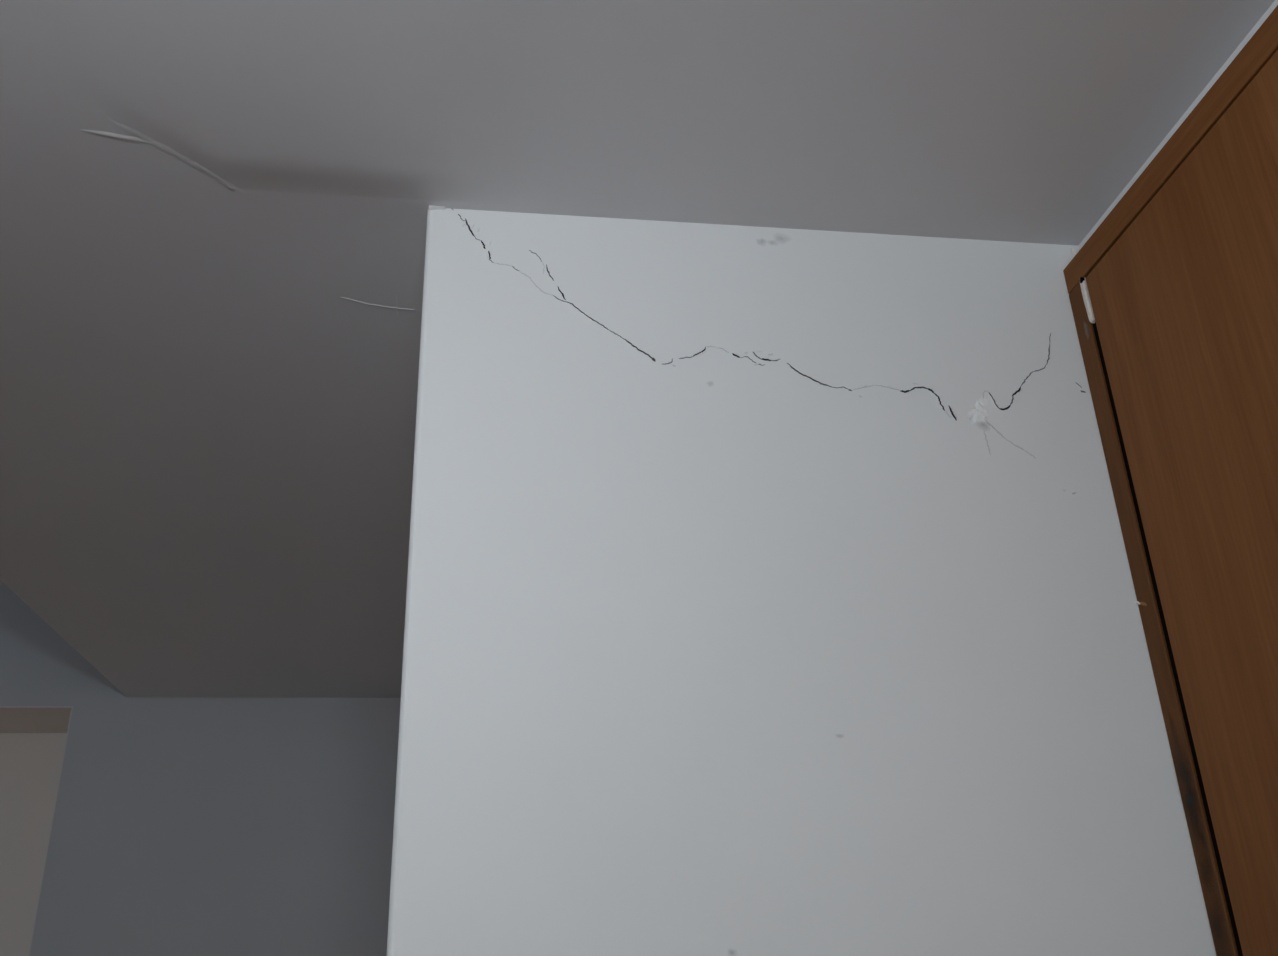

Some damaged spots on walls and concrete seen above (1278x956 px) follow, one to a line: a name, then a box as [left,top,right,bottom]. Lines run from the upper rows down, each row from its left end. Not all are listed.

crack [451,208,957,421]
crack [988,334,1051,410]